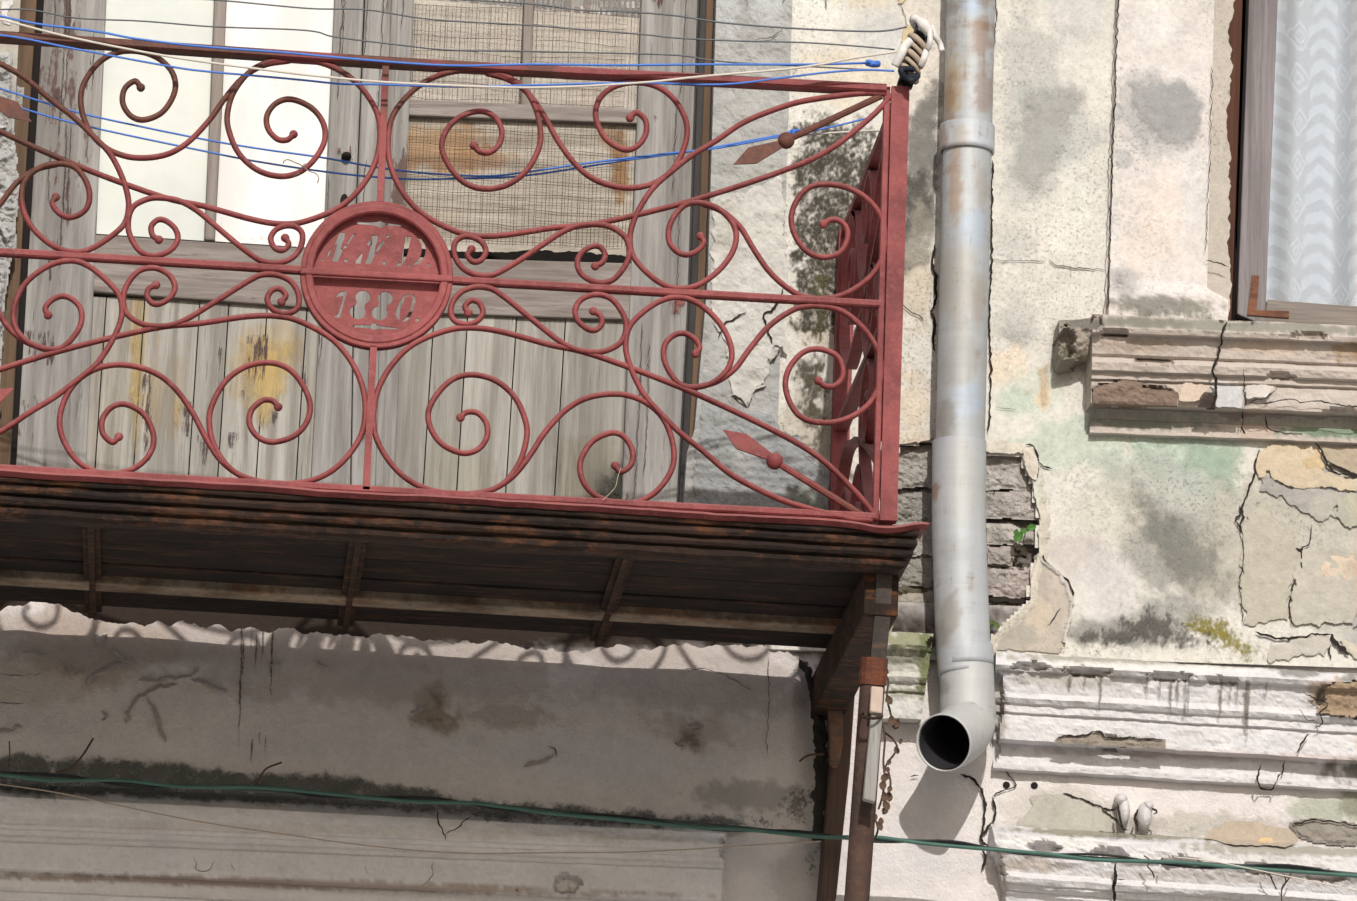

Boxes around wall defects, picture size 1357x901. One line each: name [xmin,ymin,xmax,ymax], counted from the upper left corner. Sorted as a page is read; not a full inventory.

water stain [1132,78,1201,142]
water stain [789,111,876,451]
flaking render [895,429,936,603]
flaking render [985,440,1074,655]
crack [1211,322,1357,659]
peeling [1238,443,1357,663]
water stain [239,628,274,721]
flaking render [1317,681,1357,717]
water stain [50,757,743,829]
crack [961,771,1017,869]
crack [1063,793,1158,832]
crack [1112,863,1125,901]